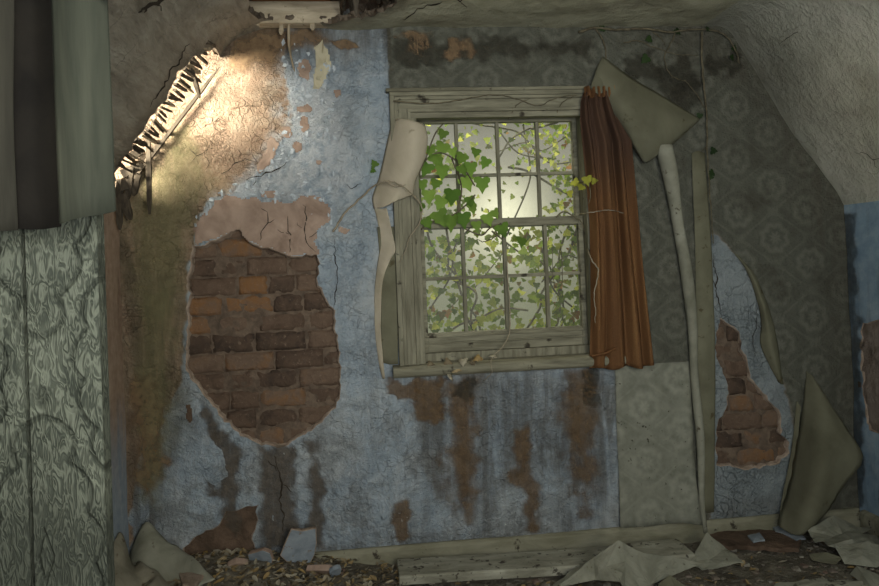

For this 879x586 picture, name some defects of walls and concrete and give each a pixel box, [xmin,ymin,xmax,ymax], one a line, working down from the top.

crack [138,0,164,13]
flaking render [185,38,359,447]
flaking render [657,144,801,534]
flaking render [860,319,879,434]
rust [392,500,411,541]
rust [388,376,479,522]
rust [509,428,539,532]